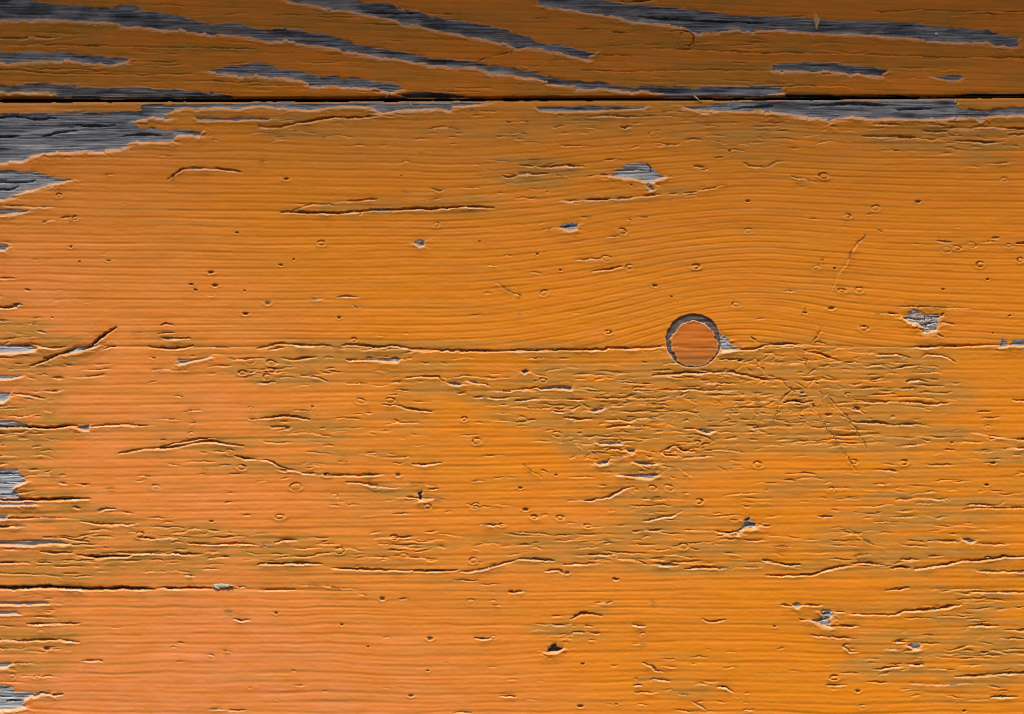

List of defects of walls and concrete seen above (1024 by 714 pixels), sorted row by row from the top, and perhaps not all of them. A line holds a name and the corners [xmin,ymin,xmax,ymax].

peeling [0,0,1024,122]
peeling [0,62,485,215]
crack [291,199,377,214]
crack [402,189,484,210]
peeling [611,163,663,190]
peeling [904,310,939,333]
crack [0,289,180,448]
crack [516,347,626,359]
crack [562,307,956,469]
crack [138,397,220,449]
peeling [0,469,37,519]
crack [0,475,199,590]